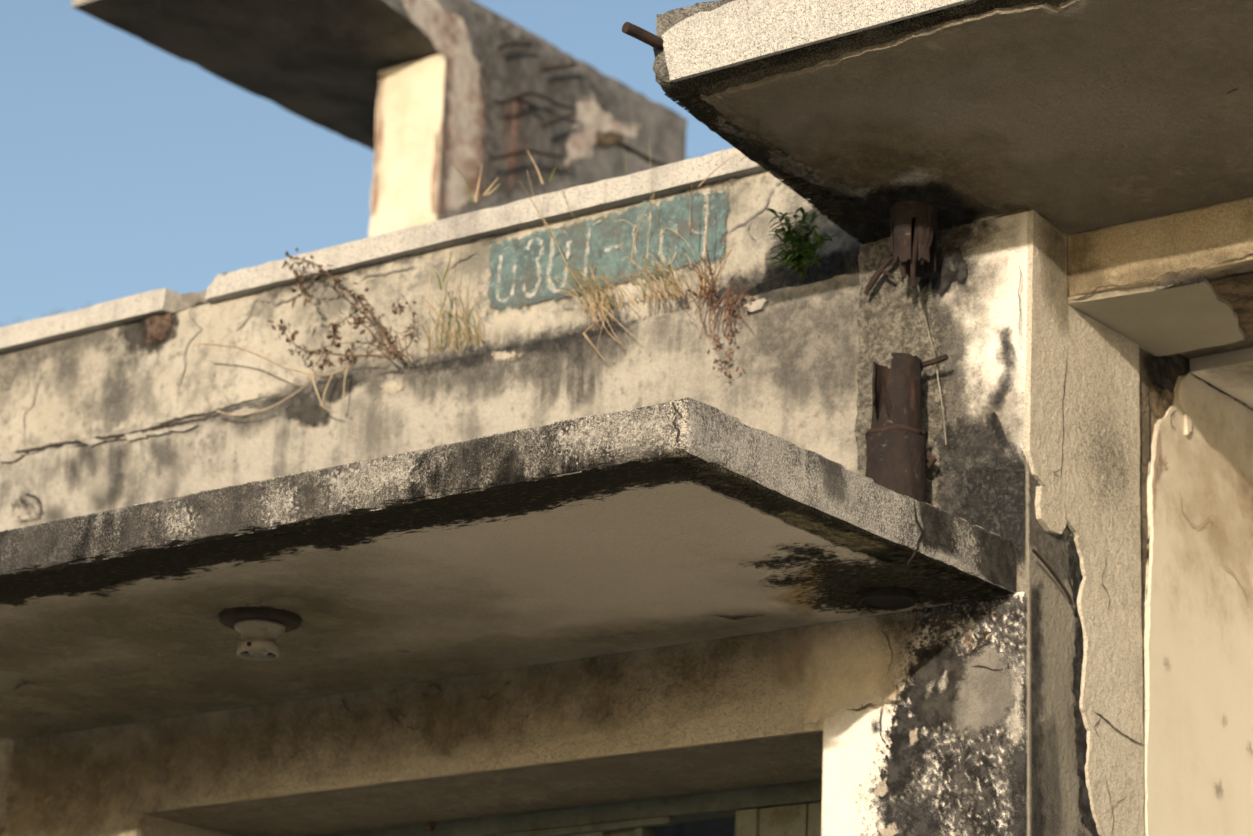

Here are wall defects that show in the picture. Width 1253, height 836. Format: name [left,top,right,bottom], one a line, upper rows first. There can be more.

spalling [402,0,640,211]
crack [0,305,266,463]
spalling [119,311,179,355]
leakage [718,94,1027,408]
spalling [1157,268,1253,338]
crack [25,493,43,513]
leakage [0,316,1099,836]
crack [1068,555,1110,611]
crack [1146,380,1253,600]
crack [1094,713,1146,746]